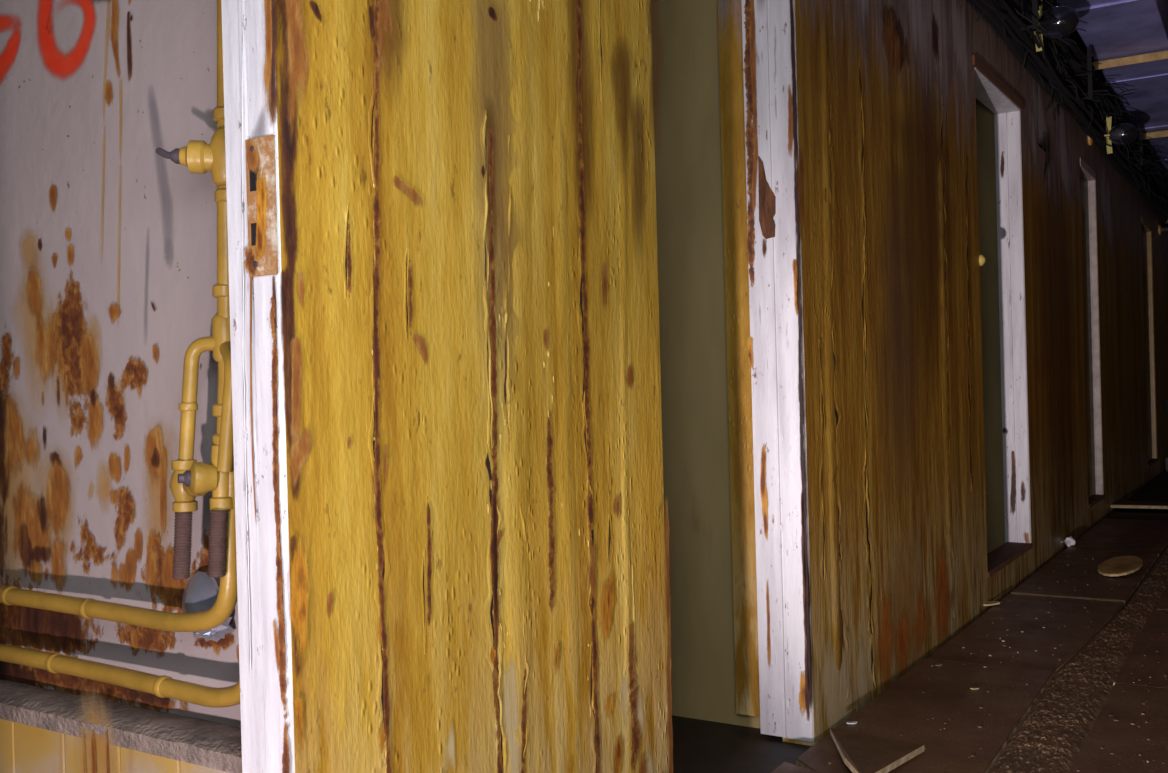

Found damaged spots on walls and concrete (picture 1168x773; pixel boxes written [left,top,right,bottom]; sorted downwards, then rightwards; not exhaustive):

corrosion [103,0,133,154]
corrosion [743,0,758,287]
corrosion [49,185,57,211]
corrosion [244,140,267,519]
corrosion [408,260,428,363]
corrosion [0,228,209,613]
corrosion [264,0,322,773]
corrosion [760,445,768,538]
corrosion [0,603,175,658]
corrosion [0,661,189,713]
corrosion [194,633,239,661]
corrosion [83,717,112,773]